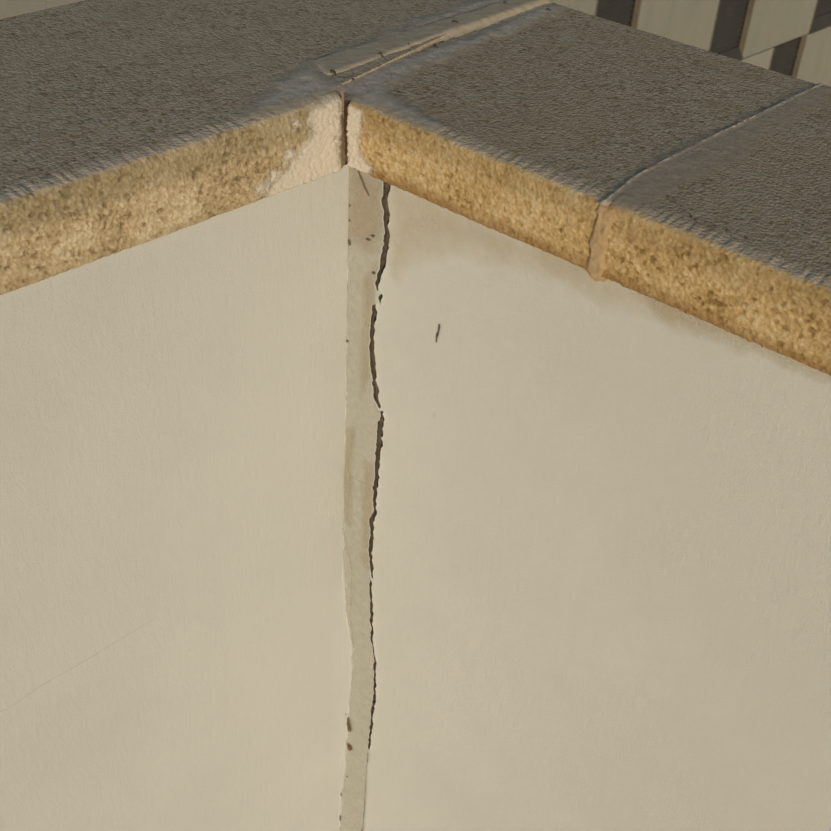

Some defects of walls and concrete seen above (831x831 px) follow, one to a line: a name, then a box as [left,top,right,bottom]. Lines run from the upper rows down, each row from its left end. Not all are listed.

crack [358,171,391,762]